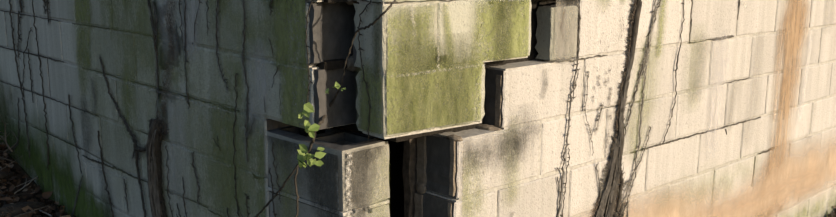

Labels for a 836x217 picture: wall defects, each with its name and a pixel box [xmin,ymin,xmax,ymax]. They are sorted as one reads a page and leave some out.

crack [0,0,163,39]
crack [689,0,740,44]
crack [32,126,147,182]
crack [0,46,240,117]
crack [299,0,608,217]
crack [631,116,761,154]
corrosion [768,0,805,177]